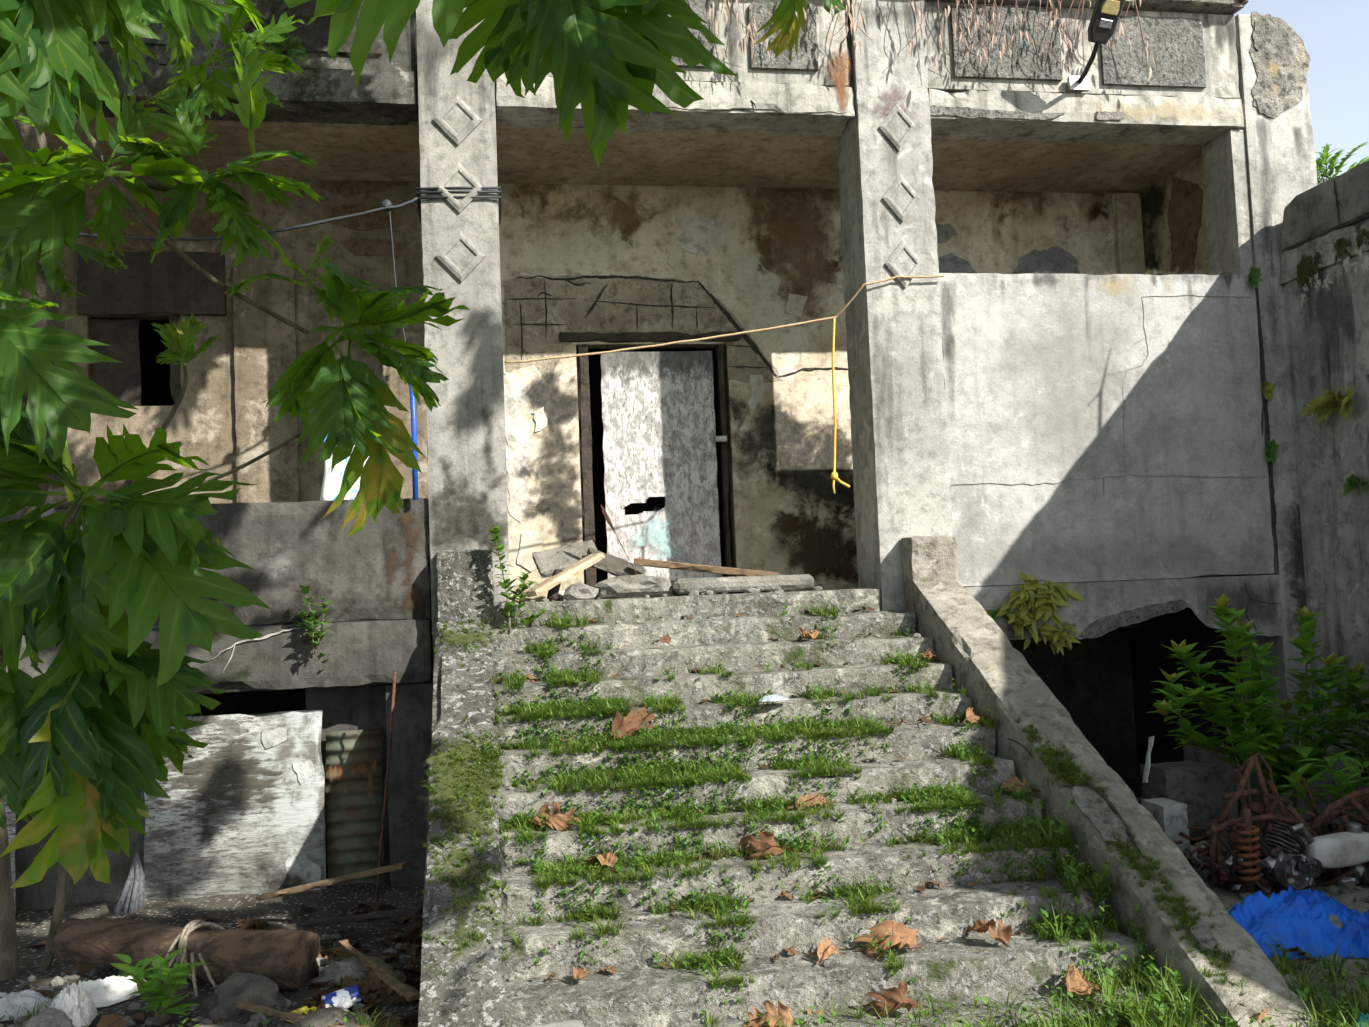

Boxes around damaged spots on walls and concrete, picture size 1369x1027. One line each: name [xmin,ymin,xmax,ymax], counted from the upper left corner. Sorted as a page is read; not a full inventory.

spalling [1249,11,1310,119]
water stain [745,188,843,317]
crack [517,275,848,377]
water stain [431,410,509,550]
water stain [519,371,584,546]
water stain [728,396,859,585]
crack [954,287,1279,630]
spalling [1003,599,1191,640]
water stain [165,737,284,846]
water stain [244,863,307,891]